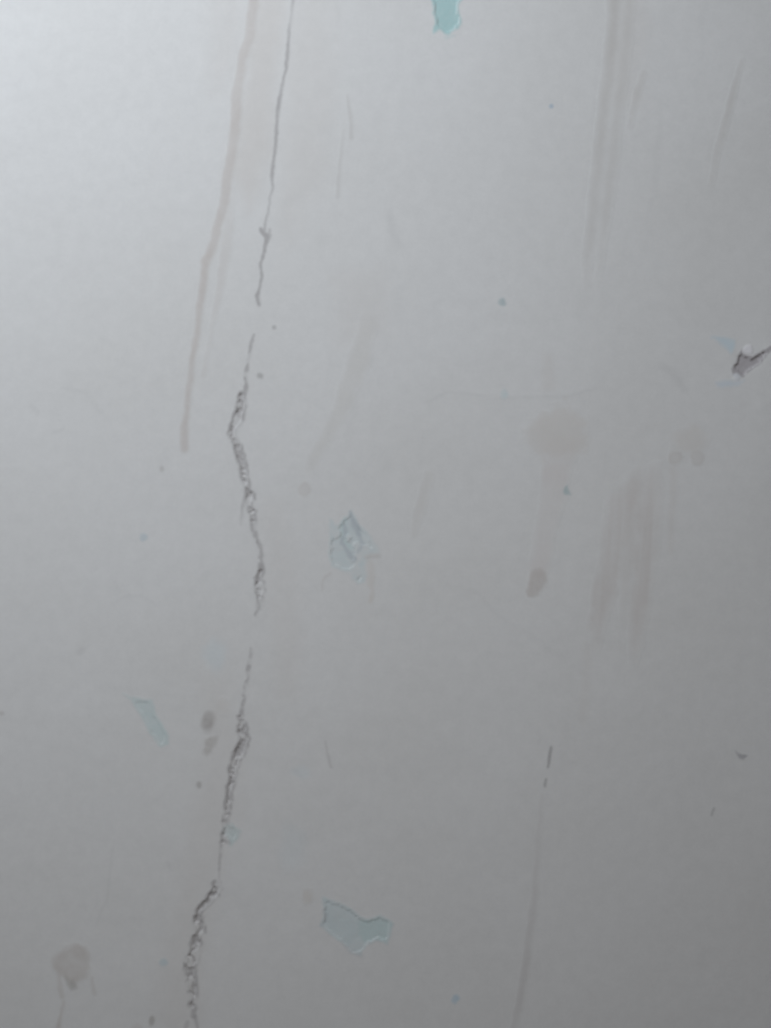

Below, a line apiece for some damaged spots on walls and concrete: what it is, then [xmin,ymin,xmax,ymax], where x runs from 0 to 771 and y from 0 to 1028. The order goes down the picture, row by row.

leakage [178,0,261,455]
crack [225,333,267,619]
crack [254,0,296,307]
peeling [430,0,463,41]
flaking render [709,334,771,390]
crack [180,645,253,1028]